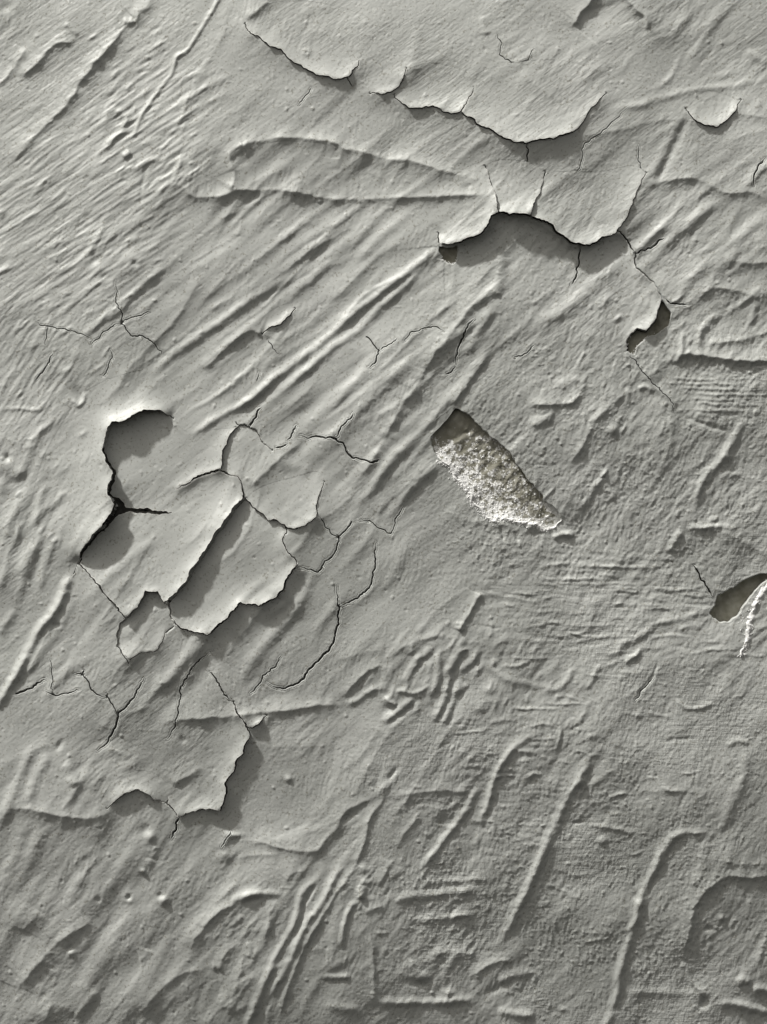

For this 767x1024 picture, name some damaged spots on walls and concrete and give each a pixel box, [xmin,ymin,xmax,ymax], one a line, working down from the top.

peeling [244,1,690,416]
crack [34,280,166,382]
crack [341,317,476,376]
peeling [30,370,326,666]
crack [275,412,393,478]
peeling [427,406,564,533]
crack [163,503,405,741]
peeling [707,571,767,658]
crack [8,658,146,753]
peeling [101,701,267,840]